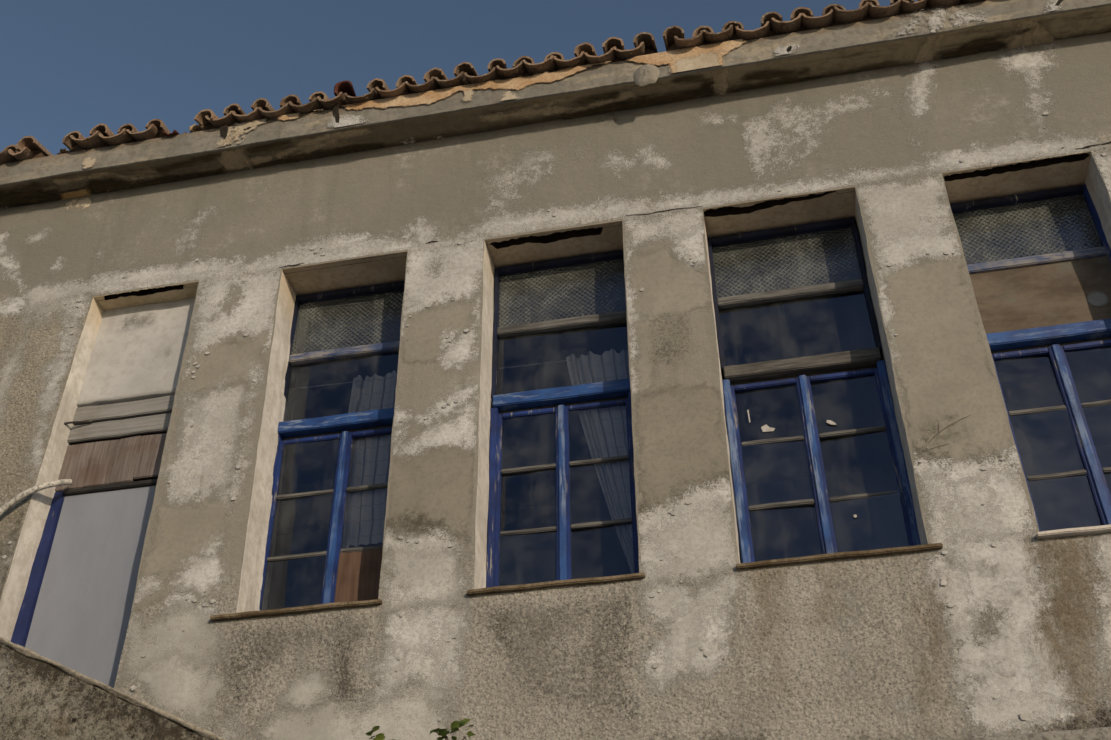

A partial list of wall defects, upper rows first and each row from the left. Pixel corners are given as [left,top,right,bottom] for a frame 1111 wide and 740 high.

peeling [886,3,999,37]